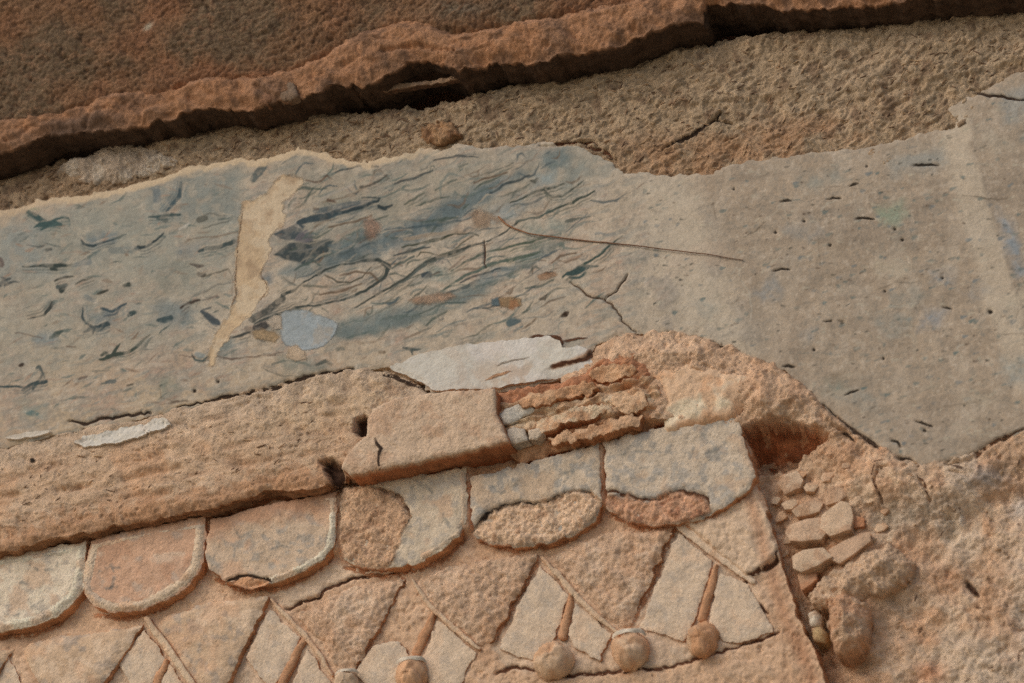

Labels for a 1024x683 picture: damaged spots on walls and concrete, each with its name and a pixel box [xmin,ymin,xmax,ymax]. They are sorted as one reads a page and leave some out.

crack [974,92,1024,101]
crack [555,142,614,160]
crack [666,114,730,148]
peeling [208,174,303,366]
crack [572,276,635,332]
peeling [253,310,337,361]
spalling [499,353,662,464]
spalling [745,428,819,474]